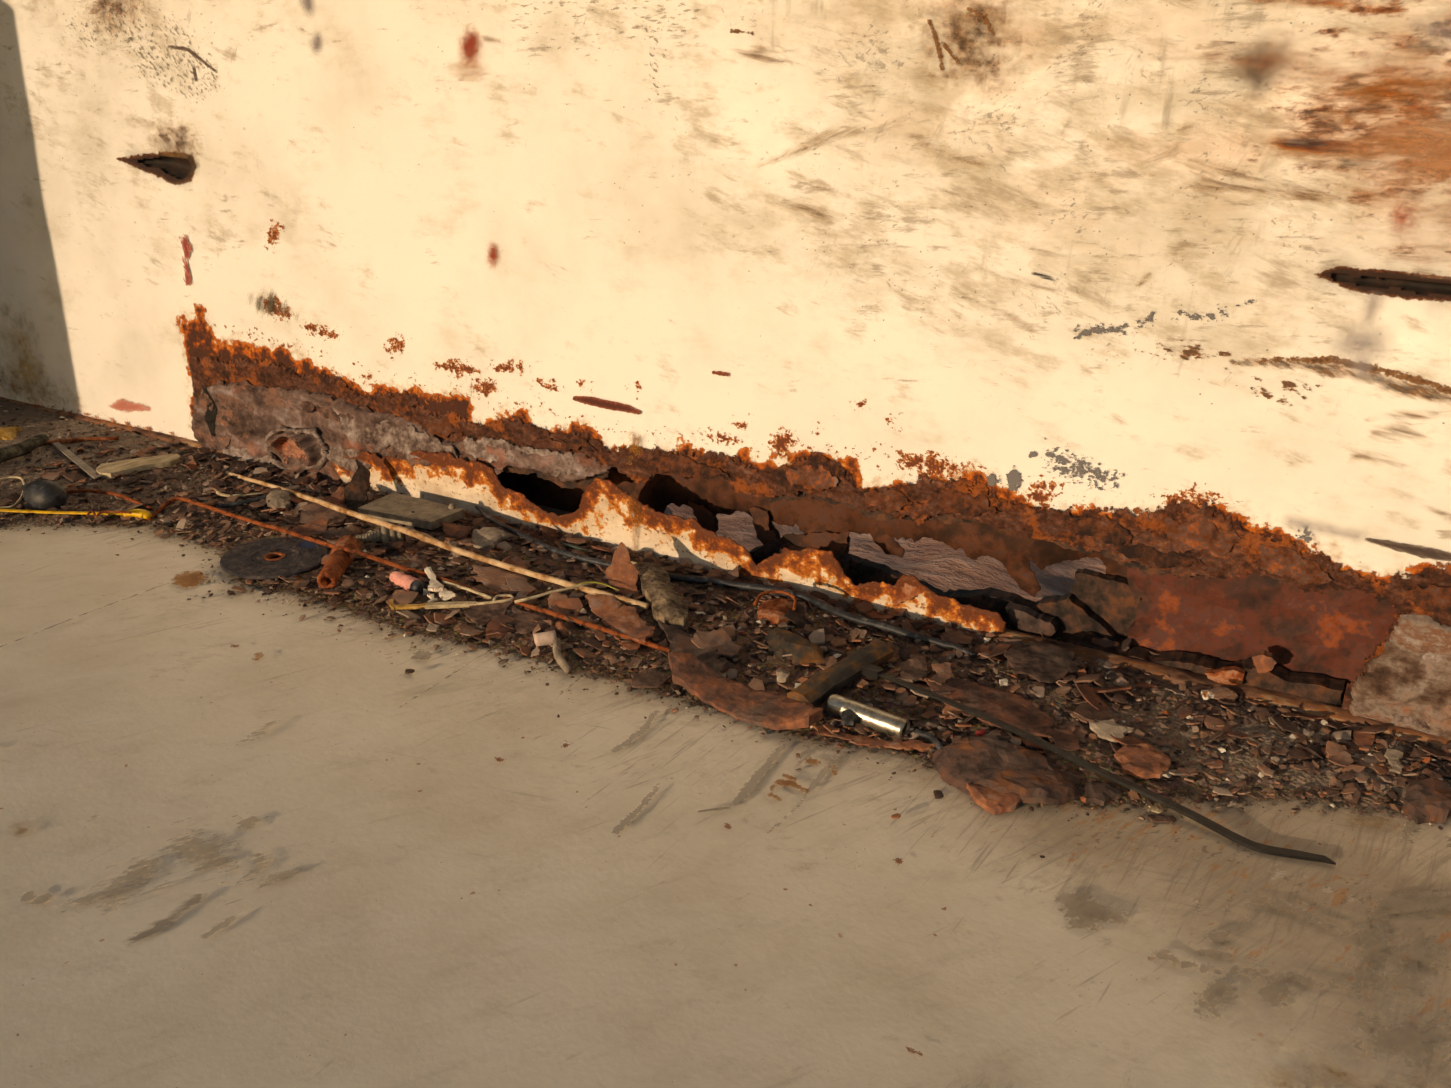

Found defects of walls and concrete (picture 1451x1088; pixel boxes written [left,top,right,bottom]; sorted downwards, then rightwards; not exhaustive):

rust [91,0,135,21]
rust [927,5,1000,77]
rust [1319,0,1398,37]
rust [1271,20,1451,225]
rust [266,219,284,253]
peeling [987,437,1124,499]
rust [35,294,1451,739]